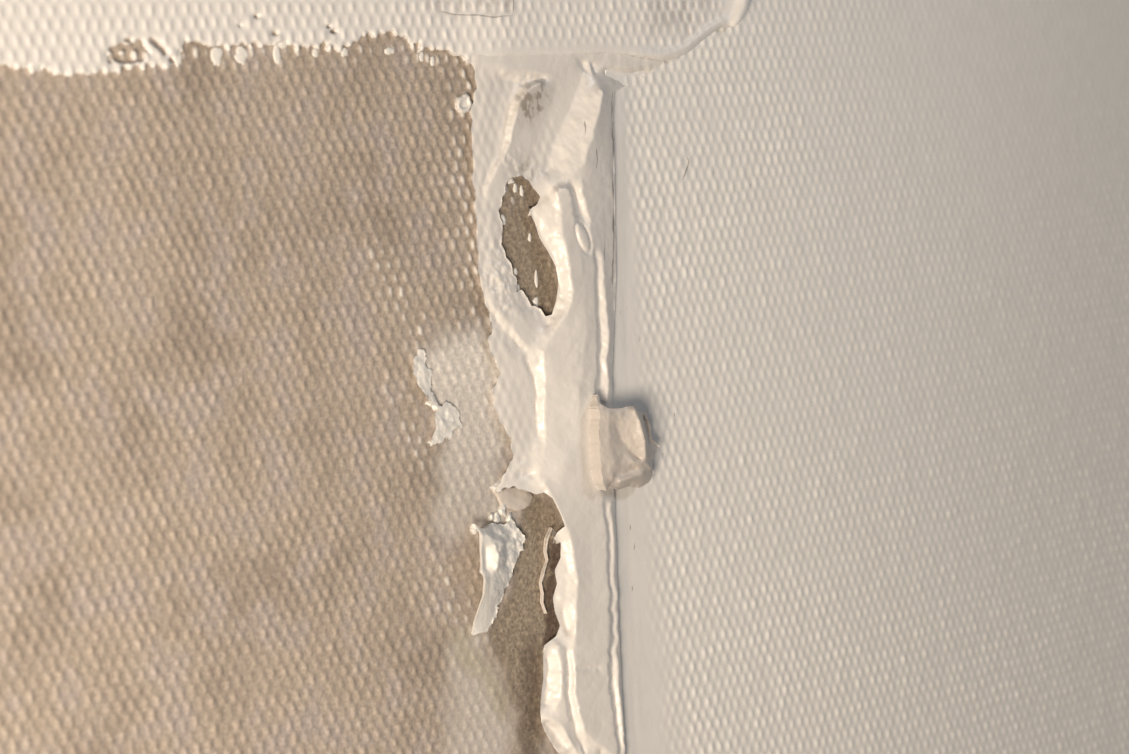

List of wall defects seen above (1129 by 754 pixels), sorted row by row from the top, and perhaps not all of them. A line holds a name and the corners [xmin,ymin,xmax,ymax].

peeling [455,93,473,113]
peeling [499,177,557,314]
peeling [413,349,462,446]
peeling [470,498,561,751]